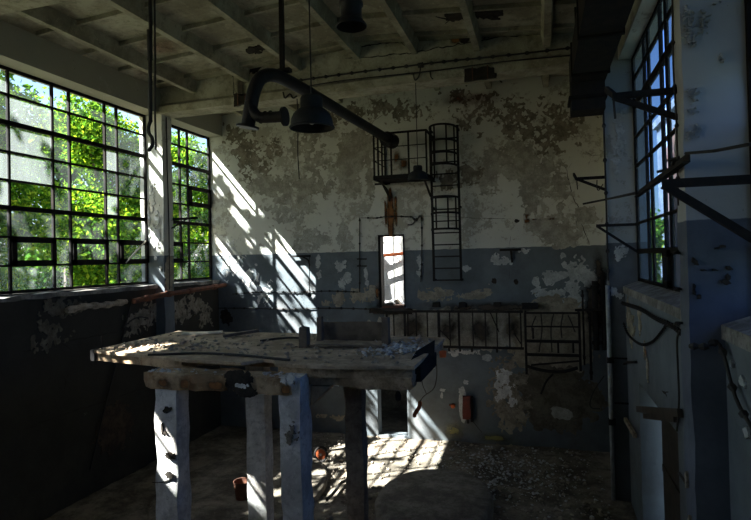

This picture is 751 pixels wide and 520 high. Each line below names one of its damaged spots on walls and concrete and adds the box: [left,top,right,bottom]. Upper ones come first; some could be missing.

corrosion [384,188,397,236]
flaking render [219,65,601,407]
peeling [614,245,629,262]
peeling [122,300,157,338]
peeling [174,292,233,328]